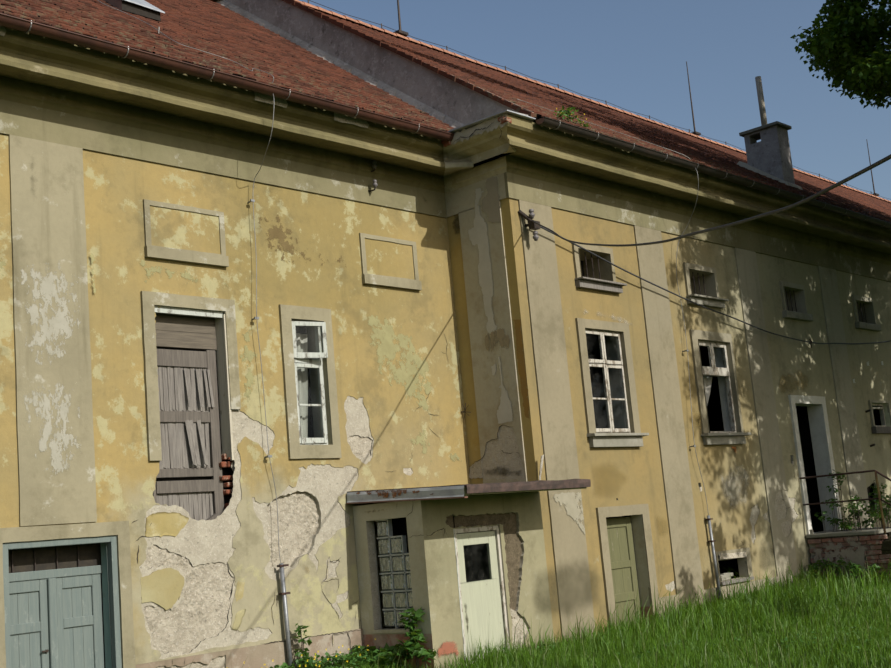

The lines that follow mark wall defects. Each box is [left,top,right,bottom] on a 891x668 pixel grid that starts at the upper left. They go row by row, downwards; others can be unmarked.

peeling [21,261,81,365]
flaking render [450,188,529,481]
peeling [24,382,81,475]
flaking render [139,410,275,668]
flaking render [252,396,374,583]
flaking render [781,497,798,537]
flaking render [333,633,350,654]